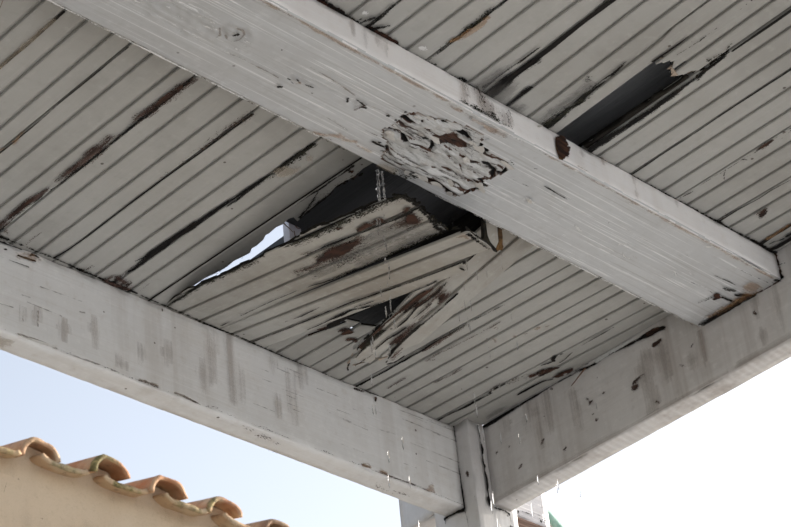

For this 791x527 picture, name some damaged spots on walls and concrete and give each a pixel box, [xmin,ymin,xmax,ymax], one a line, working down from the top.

leakage [0,77,476,370]
crack [355,282,448,358]
peeling [388,289,451,361]